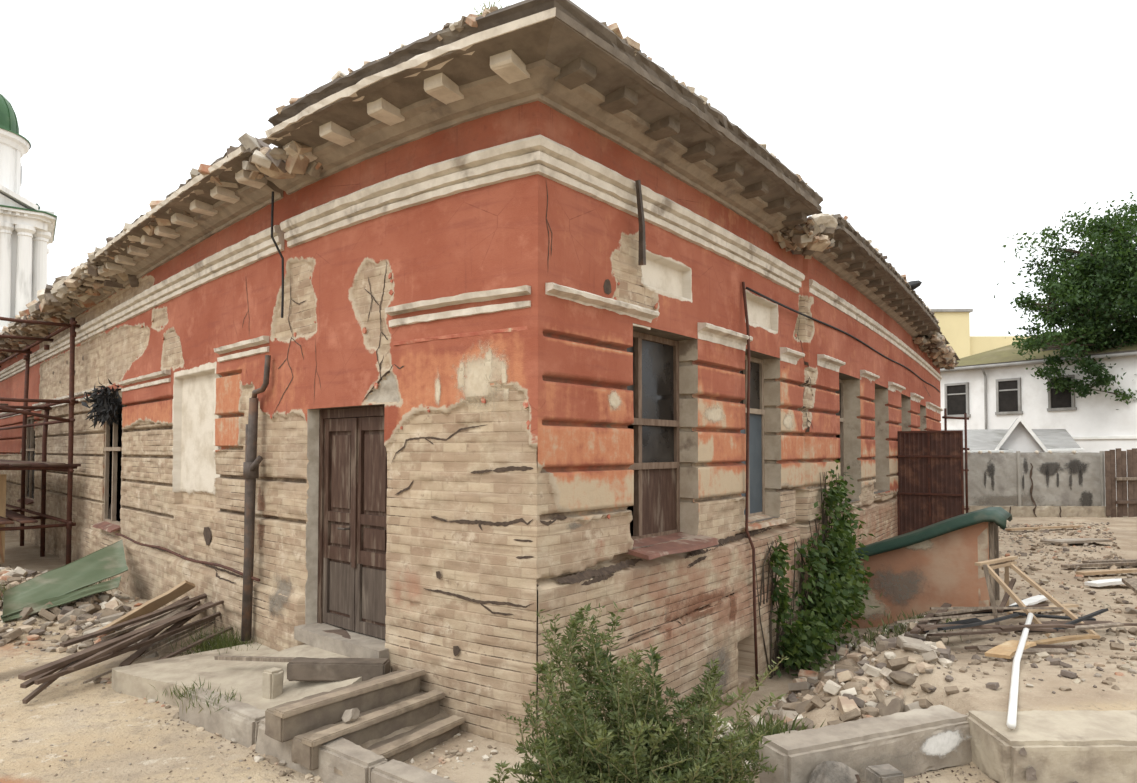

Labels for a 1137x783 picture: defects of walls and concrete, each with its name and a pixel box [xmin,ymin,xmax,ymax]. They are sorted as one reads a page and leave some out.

flaking render [272,260,316,341]
flaking render [351,260,400,403]
flaking render [604,234,658,311]
flaking render [794,296,813,341]
flaking render [798,367,816,428]
flaking render [0,276,309,651]
crack [1009,463,1061,517]
leakage [980,459,1093,506]
flaking render [385,385,898,753]